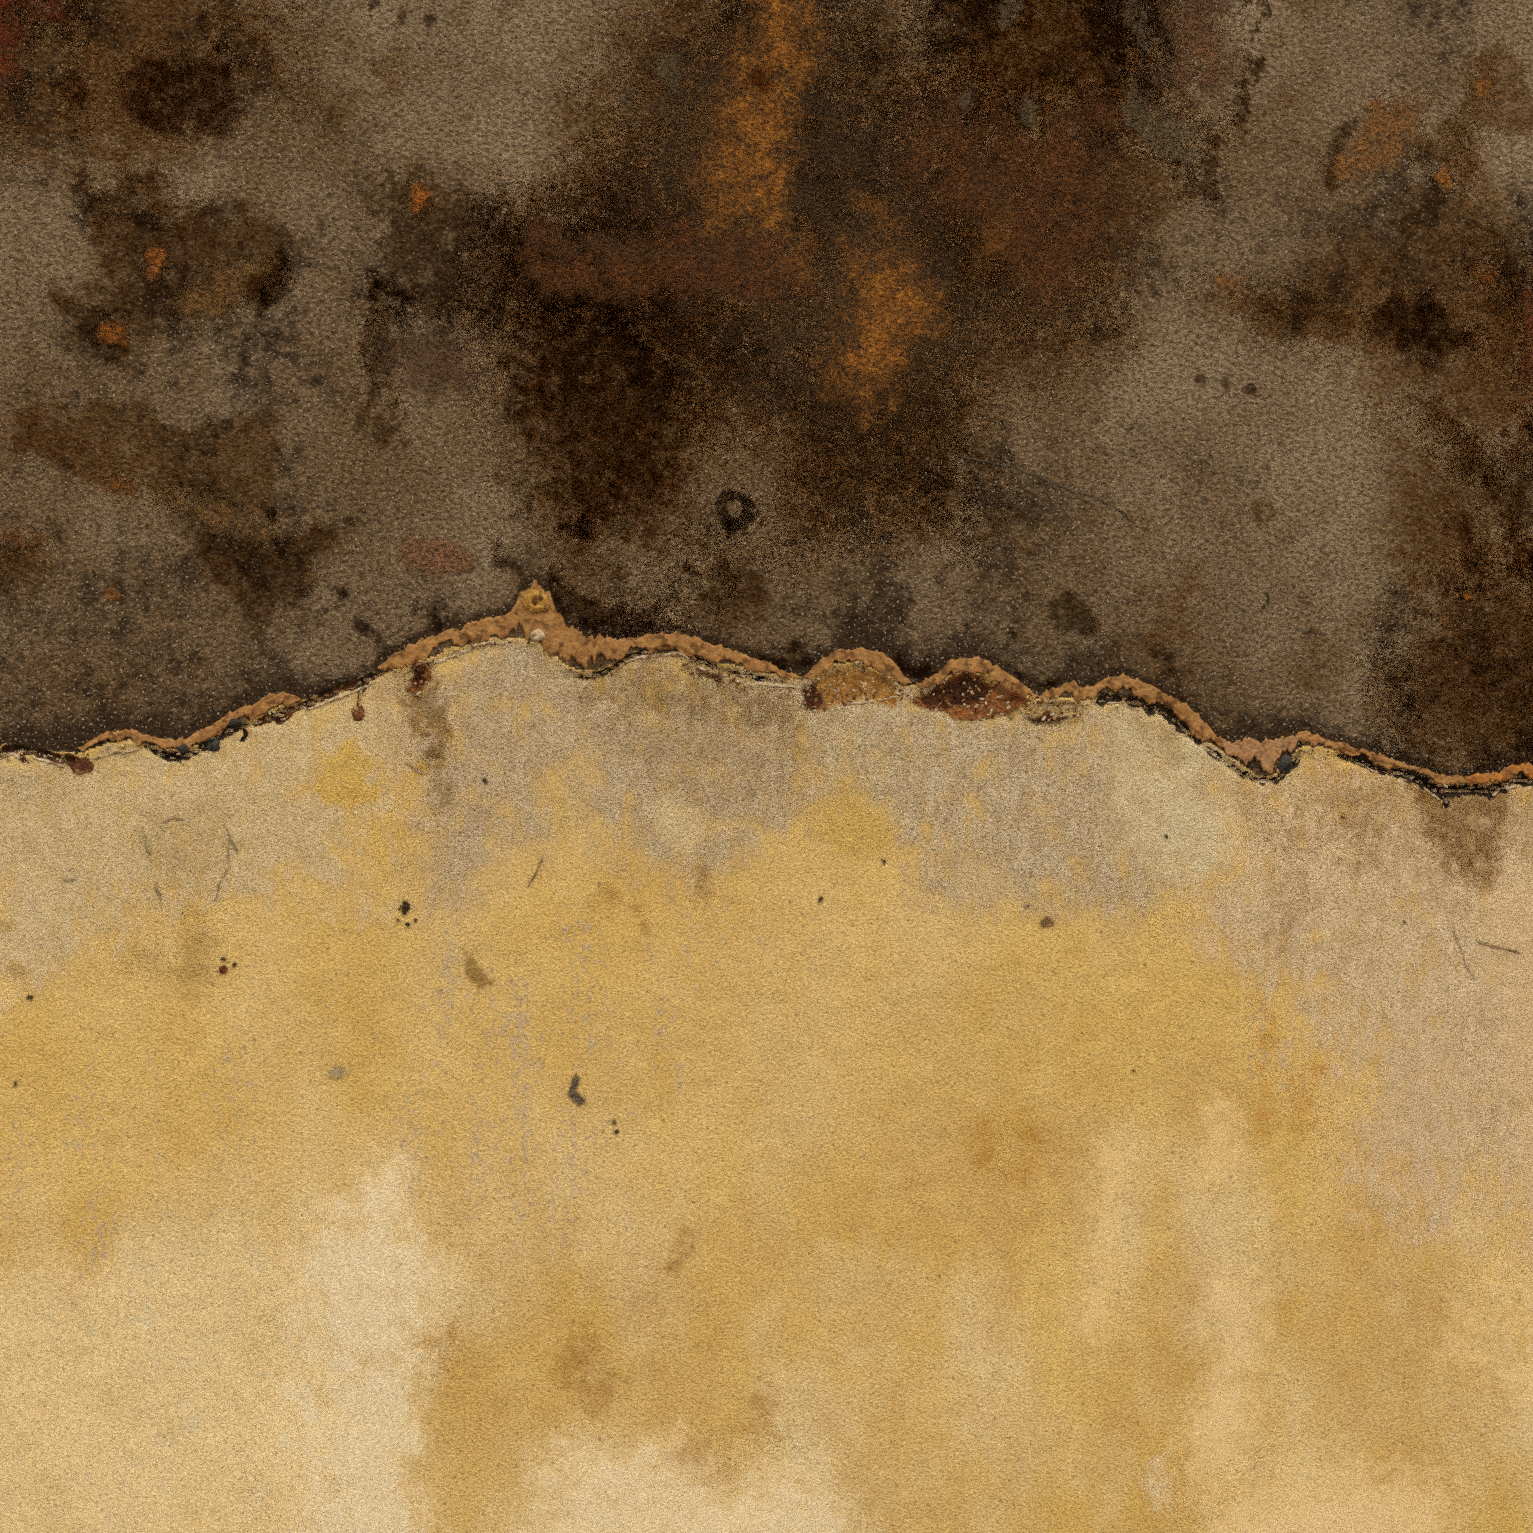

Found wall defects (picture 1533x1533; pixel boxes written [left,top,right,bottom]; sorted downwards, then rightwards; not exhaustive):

water stain [54,176,282,349]
water stain [129,60,238,131]
water stain [412,185,429,213]
water stain [526,262,703,538]
corrosion [705,0,823,232]
corrosion [834,246,942,417]
water stain [1375,295,1473,353]
peeling [0,579,1533,1252]